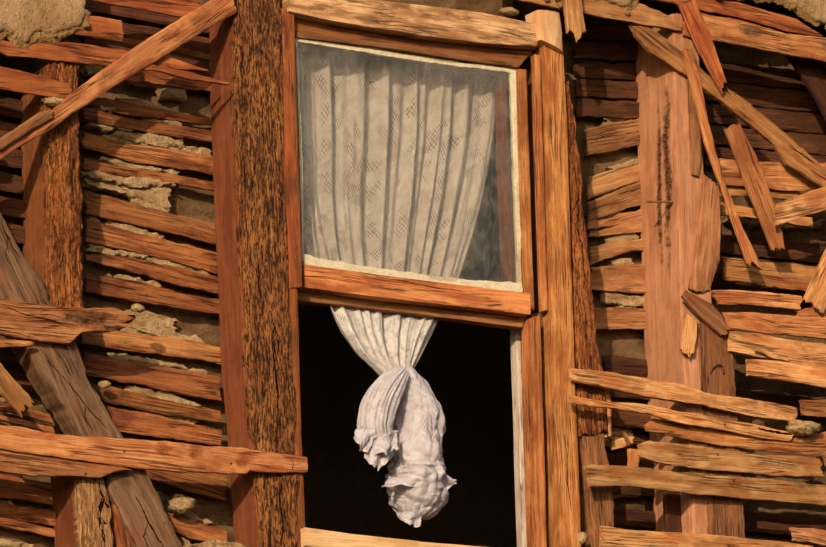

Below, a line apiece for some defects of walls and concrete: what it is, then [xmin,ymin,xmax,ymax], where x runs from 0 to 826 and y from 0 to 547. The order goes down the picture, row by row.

flaking render [0,9,91,50]
flaking render [716,0,826,29]
crack [47,360,108,429]